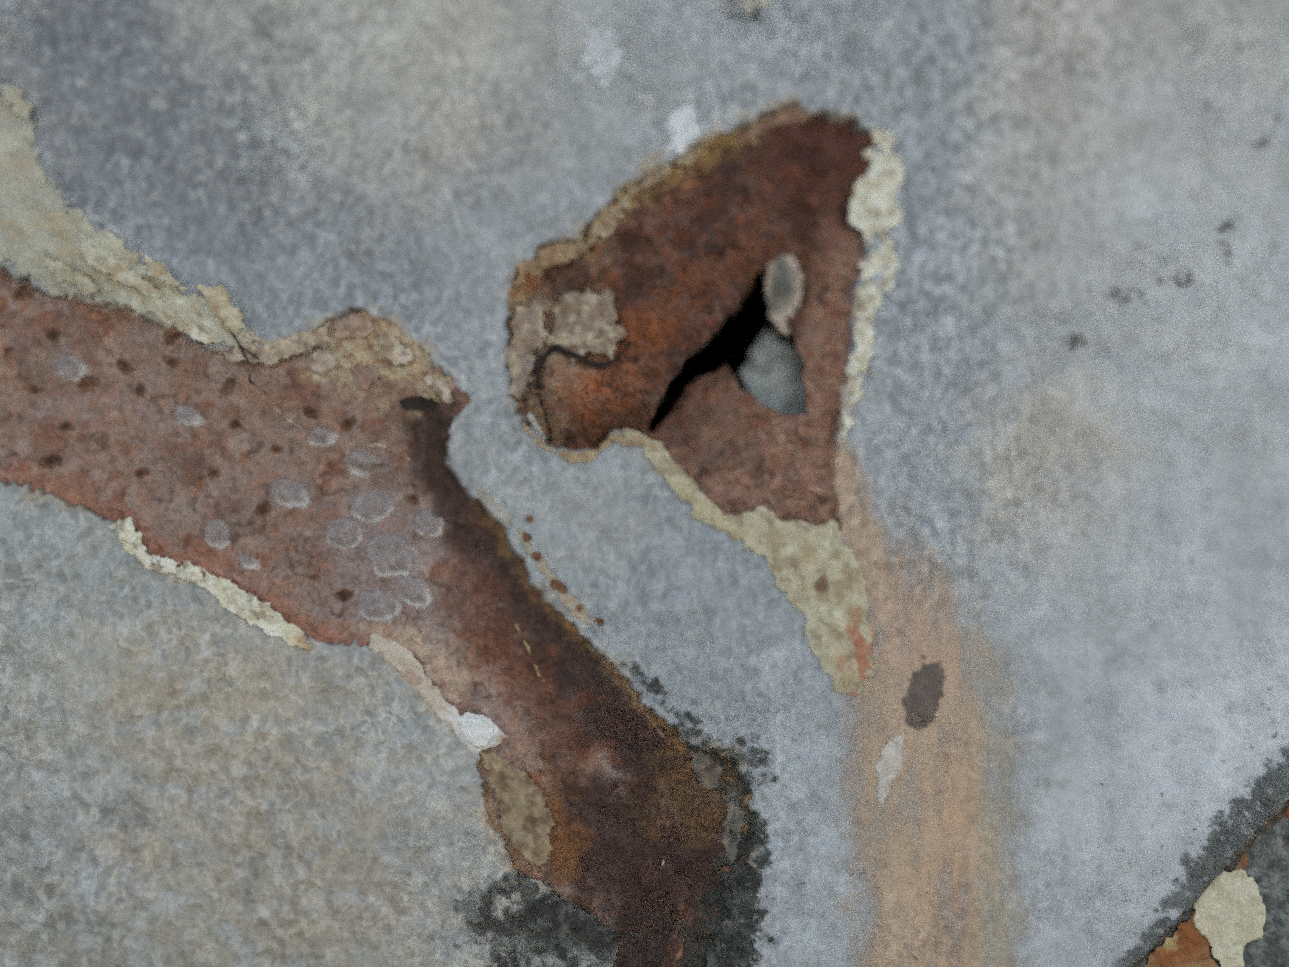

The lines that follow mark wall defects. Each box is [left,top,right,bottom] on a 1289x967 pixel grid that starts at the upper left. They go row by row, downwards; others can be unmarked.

peeling [665,105,705,153]
peeling [0,84,260,357]
peeling [108,517,312,650]
rust [0,268,754,967]
peeling [479,493,605,632]
peeling [622,428,877,697]
rust [504,105,1010,967]
peeling [368,633,509,753]
water stain [1236,733,1289,821]
water stain [1114,828,1249,967]
peeling [1193,868,1266,967]